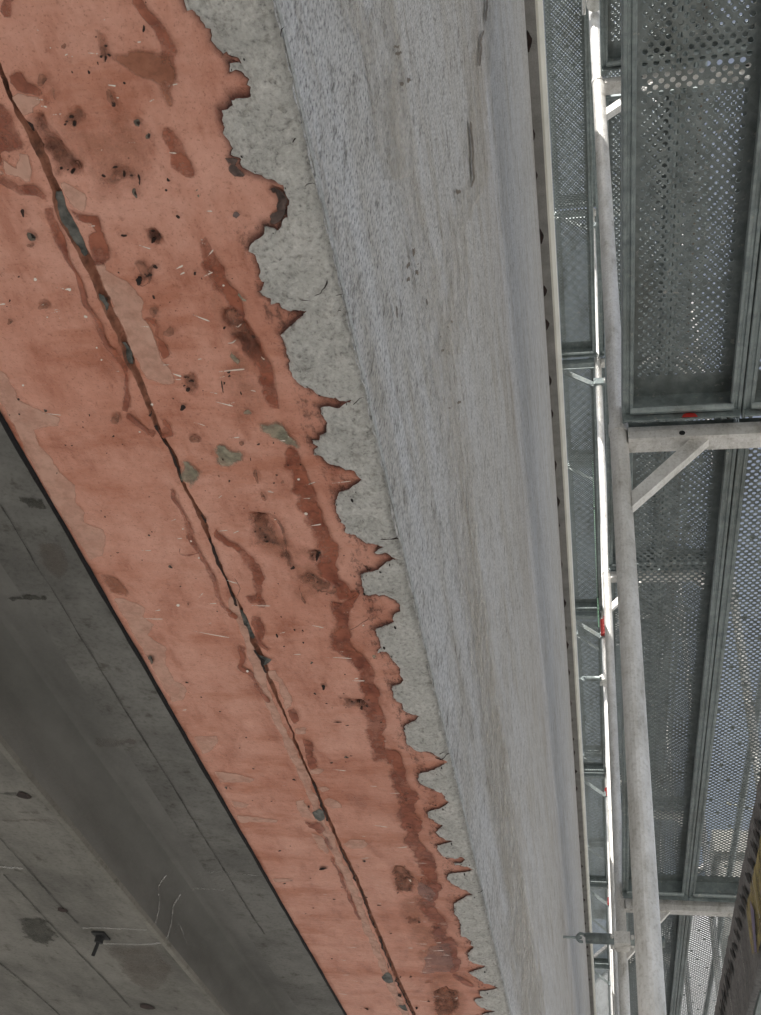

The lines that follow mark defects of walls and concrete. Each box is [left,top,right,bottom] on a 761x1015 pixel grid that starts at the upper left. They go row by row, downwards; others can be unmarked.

spalling [95,35,111,58]
rust [115,0,176,106]
spalling [13,93,86,211]
spalling [149,230,161,244]
peeling [96,261,197,392]
rust [201,240,279,408]
peeling [0,371,105,559]
crack [0,63,416,1015]
peeling [183,0,512,1015]
peeling [115,598,186,702]
rust [284,447,474,987]